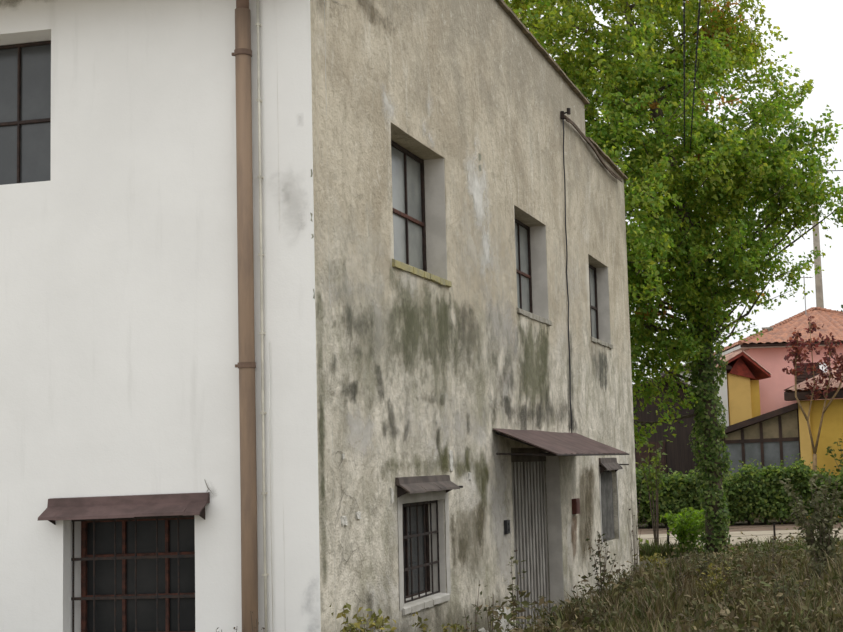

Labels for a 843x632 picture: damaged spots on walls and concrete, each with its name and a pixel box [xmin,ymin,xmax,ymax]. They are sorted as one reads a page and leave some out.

leakage [394,292,459,360]
leakage [384,405,408,437]
leakage [506,324,562,429]
crack [335,450,367,629]
leakage [452,471,488,562]